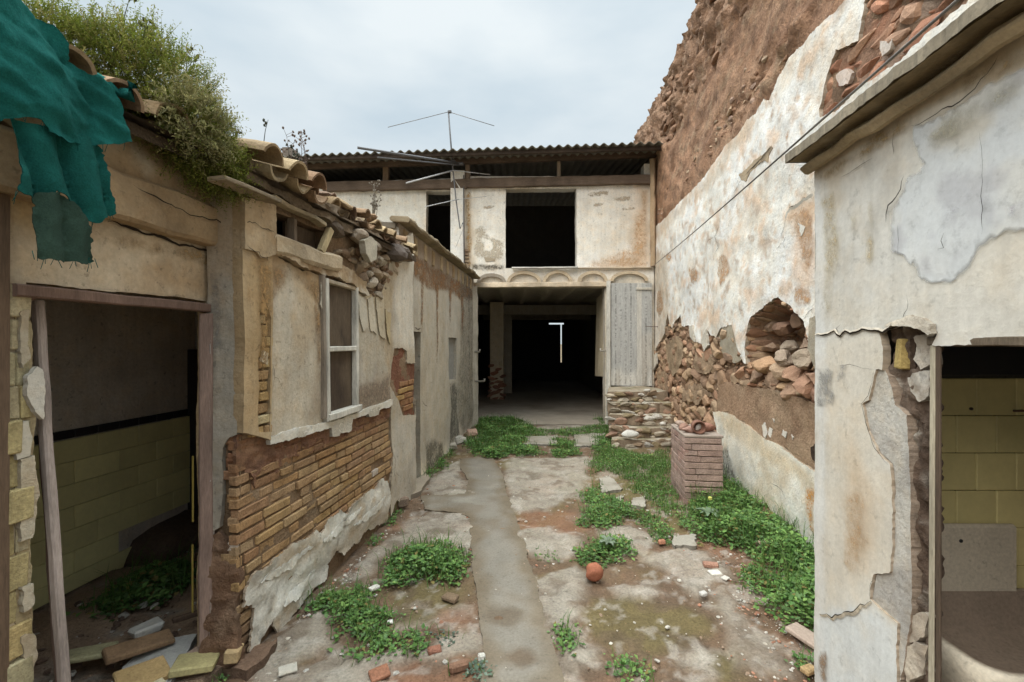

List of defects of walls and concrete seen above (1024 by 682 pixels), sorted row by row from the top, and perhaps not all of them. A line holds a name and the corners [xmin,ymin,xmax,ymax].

crack [846,56,998,175]
crack [108,221,207,251]
crack [134,185,221,223]
spalling [465,228,503,266]
peeling [891,69,1024,282]
crack [805,293,908,337]
spalling [611,283,815,470]
spalling [69,221,414,682]
spalling [889,326,945,682]